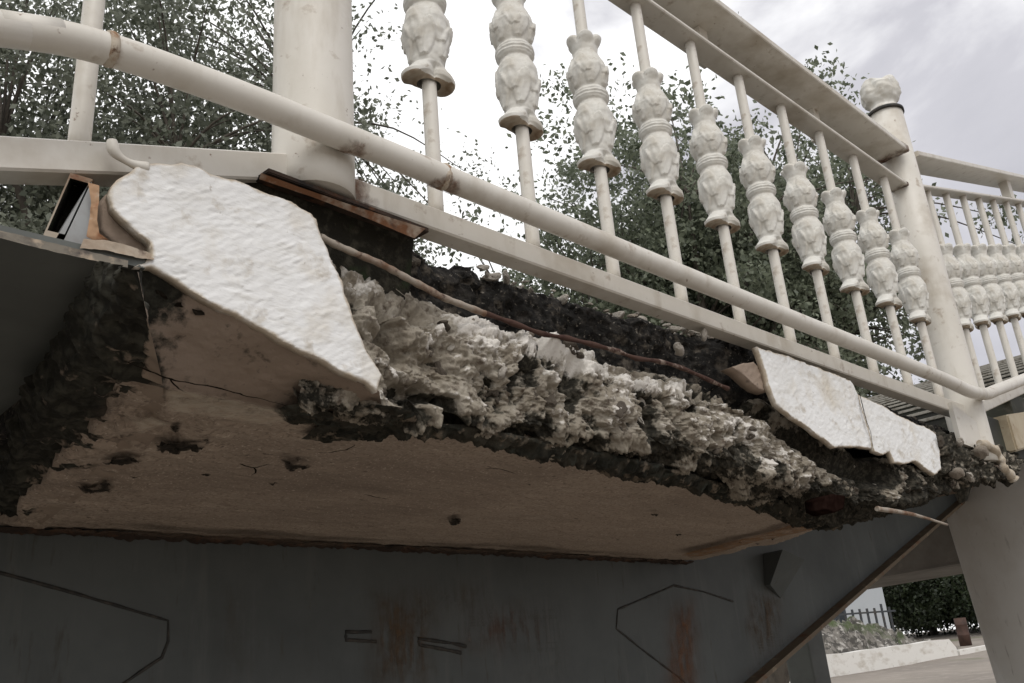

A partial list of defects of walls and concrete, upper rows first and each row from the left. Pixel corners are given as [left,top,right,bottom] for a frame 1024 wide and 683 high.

rust [355,179,367,204]
crack [125,361,287,407]
spalling [273,233,1024,527]
spalling [104,457,140,466]
spalling [79,480,110,494]